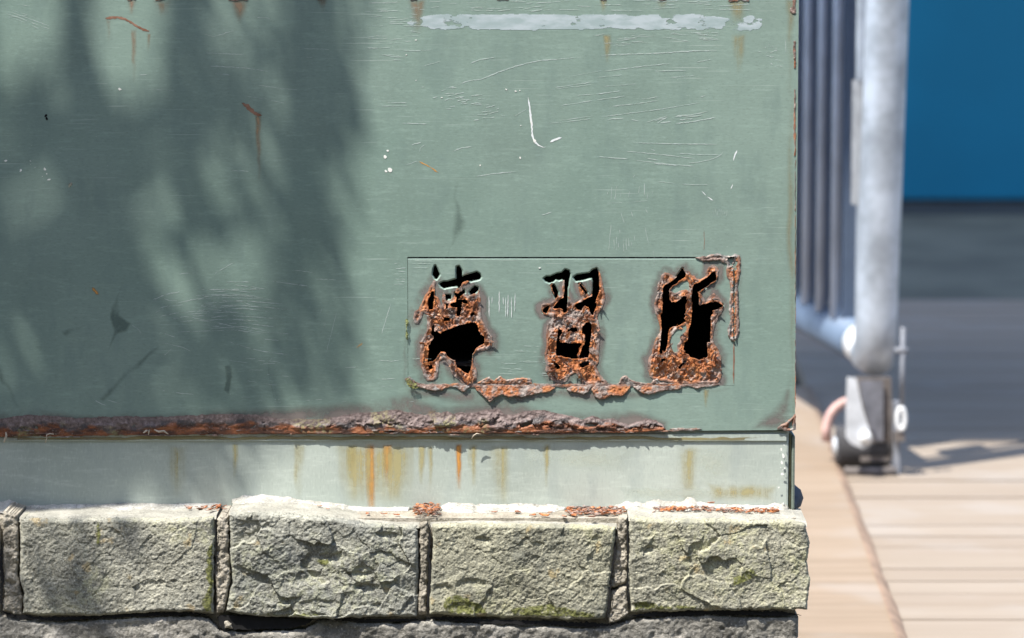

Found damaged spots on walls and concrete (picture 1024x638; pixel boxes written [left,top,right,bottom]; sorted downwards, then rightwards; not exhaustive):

rust [105,1,149,32]
peeling [407,13,762,31]
rust [422,281,498,381]
rust [535,280,592,356]
rust [0,359,749,500]